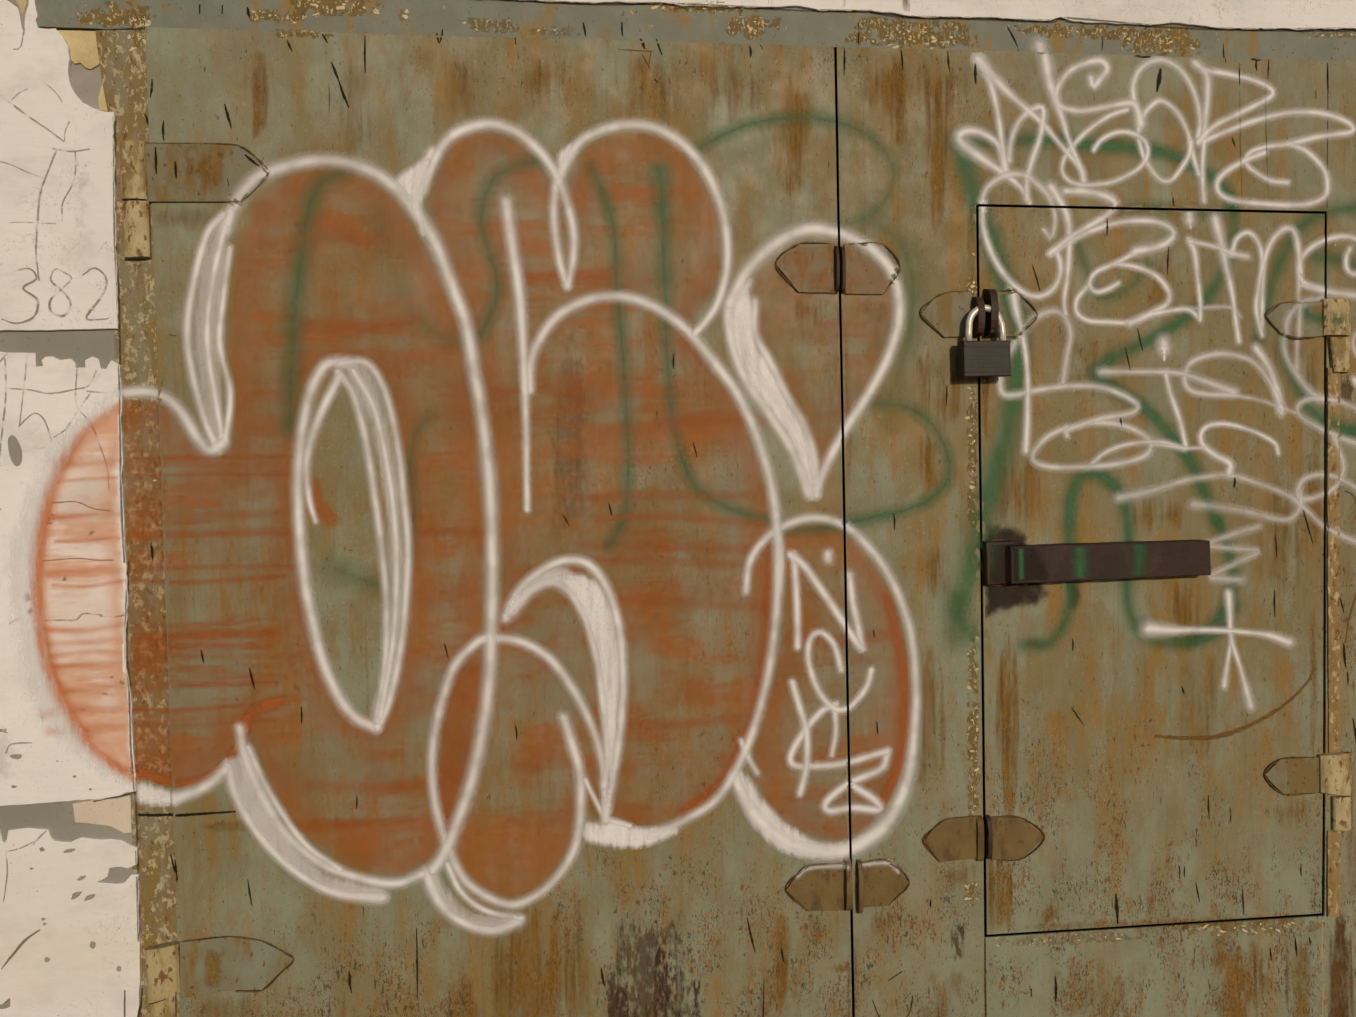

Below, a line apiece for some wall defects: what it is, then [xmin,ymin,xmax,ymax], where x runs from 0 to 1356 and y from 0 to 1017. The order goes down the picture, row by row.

flaking render [58,2,154,112]
rust [996,652,1016,815]
rust [1154,668,1315,740]
flaking render [0,788,132,853]
flaking render [71,867,133,901]
rust [607,973,628,1017]
rust [654,949,670,1008]
rust [1329,915,1349,1017]